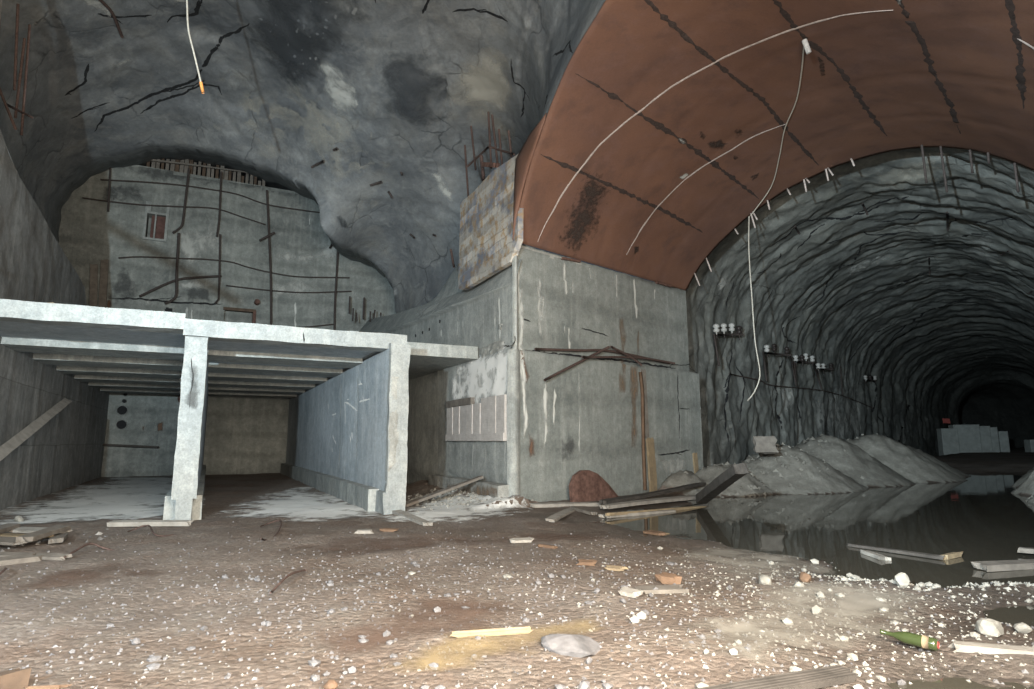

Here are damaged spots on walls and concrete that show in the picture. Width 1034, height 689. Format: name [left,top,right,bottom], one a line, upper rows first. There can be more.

crack [98,0,203,24]
crack [65,24,249,131]
leakage [385,59,444,121]
crack [553,40,573,56]